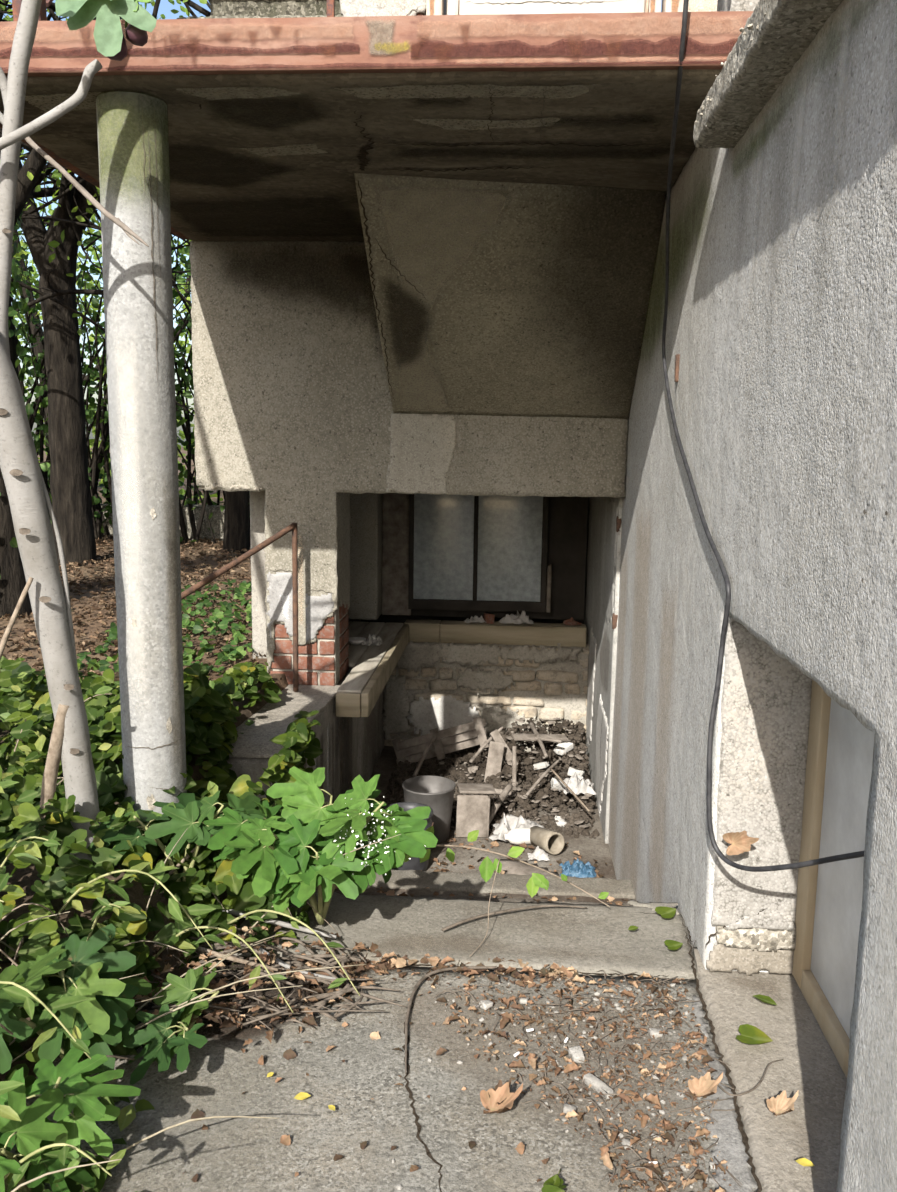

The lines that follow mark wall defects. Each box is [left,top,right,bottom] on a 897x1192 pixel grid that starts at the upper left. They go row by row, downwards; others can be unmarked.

corrosion [0,47,12,71]
corrosion [28,28,738,71]
damp [214,99,321,128]
damp [169,146,290,187]
damp [399,149,663,159]
damp [170,198,426,363]
damp [563,186,667,385]
peeling [266,569,334,643]
spalling [706,926,796,976]
crack [352,961,464,1192]